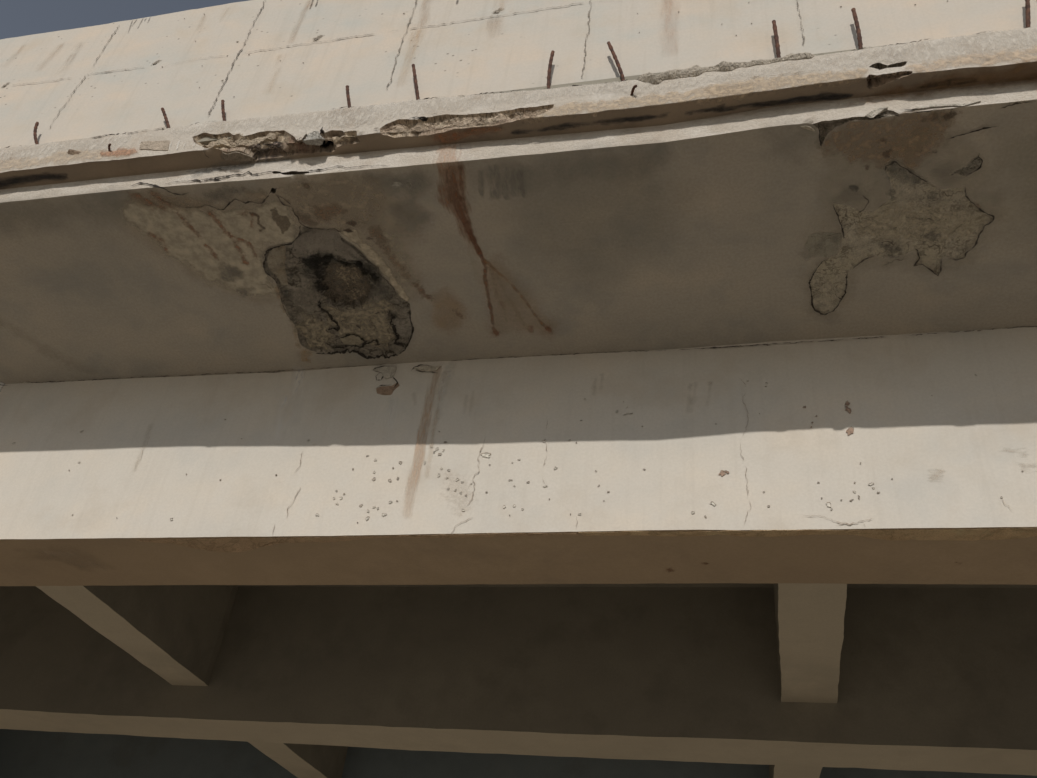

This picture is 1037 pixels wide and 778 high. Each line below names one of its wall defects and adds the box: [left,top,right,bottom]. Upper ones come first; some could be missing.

spalling [193,0,1037,161]
leakage [0,174,66,187]
peeling [123,179,428,395]
corrosion [439,165,504,334]